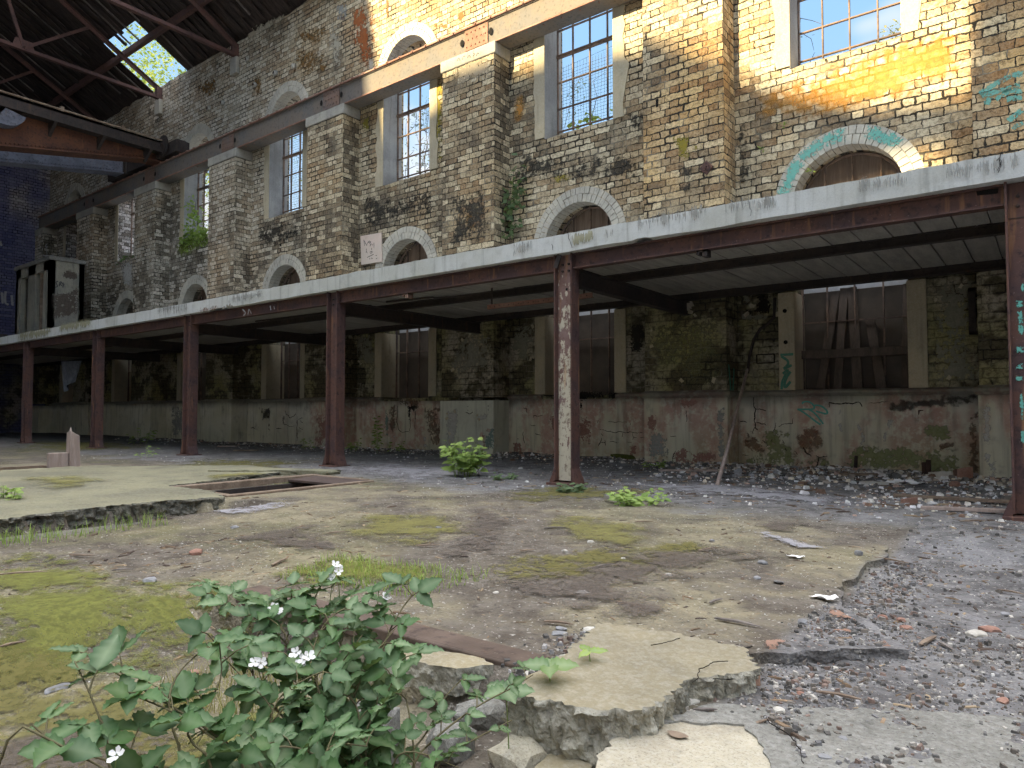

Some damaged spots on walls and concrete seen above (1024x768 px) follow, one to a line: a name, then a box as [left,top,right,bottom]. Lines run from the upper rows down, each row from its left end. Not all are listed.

corrosion [352,6,374,66]
leakage [364,191,434,226]
leakage [450,191,489,244]
crack [740,397,827,466]
leakage [847,395,976,472]